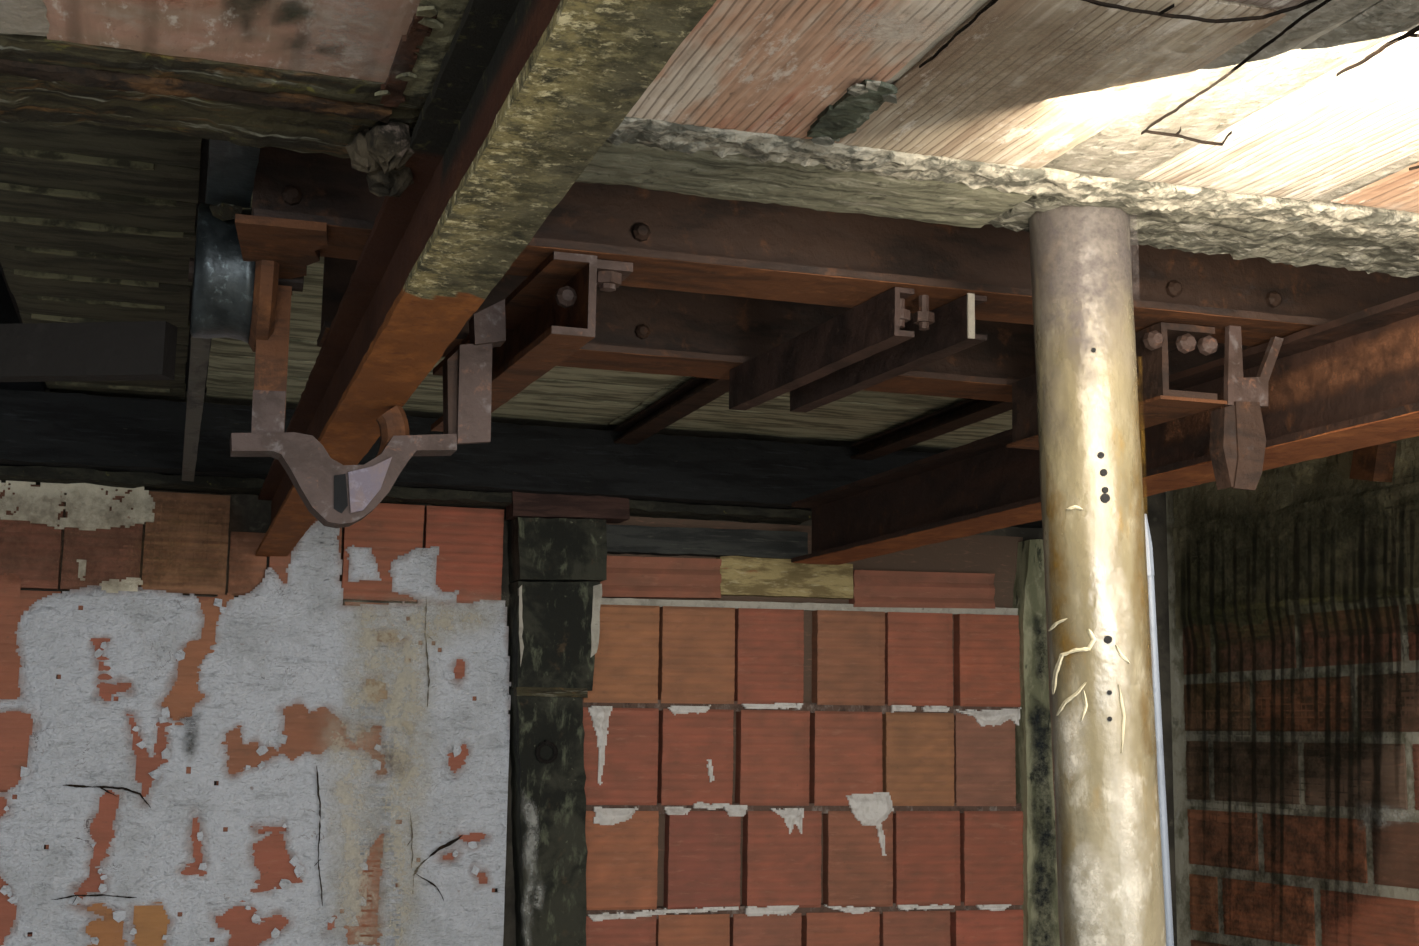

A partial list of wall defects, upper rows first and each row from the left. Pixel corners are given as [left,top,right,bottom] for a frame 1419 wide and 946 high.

crack [919,0,998,68]
crack [1082,0,1331,146]
crack [1336,25,1419,77]
corrosion [1268,325,1419,405]
peeling [0,573,33,818]
peeling [126,593,234,797]
peeling [221,704,388,775]
leakage [1181,485,1419,946]
peeling [68,790,170,946]
peeling [215,824,305,946]
leakage [523,802,542,946]
leakage [1030,706,1055,946]